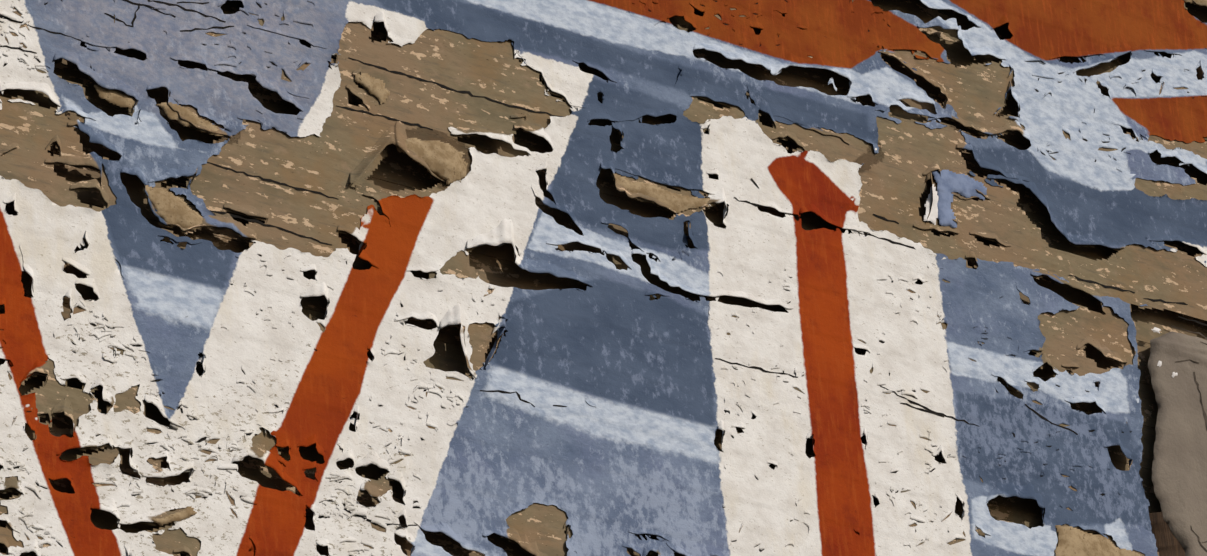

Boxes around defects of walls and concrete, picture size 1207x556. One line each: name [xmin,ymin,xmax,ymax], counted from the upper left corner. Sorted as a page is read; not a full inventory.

peeling [0,0,1207,414]
peeling [0,219,594,556]
peeling [717,362,757,469]
peeling [861,397,897,448]
peeling [875,448,991,547]
peeling [920,429,981,474]
crack [1171,325,1207,430]